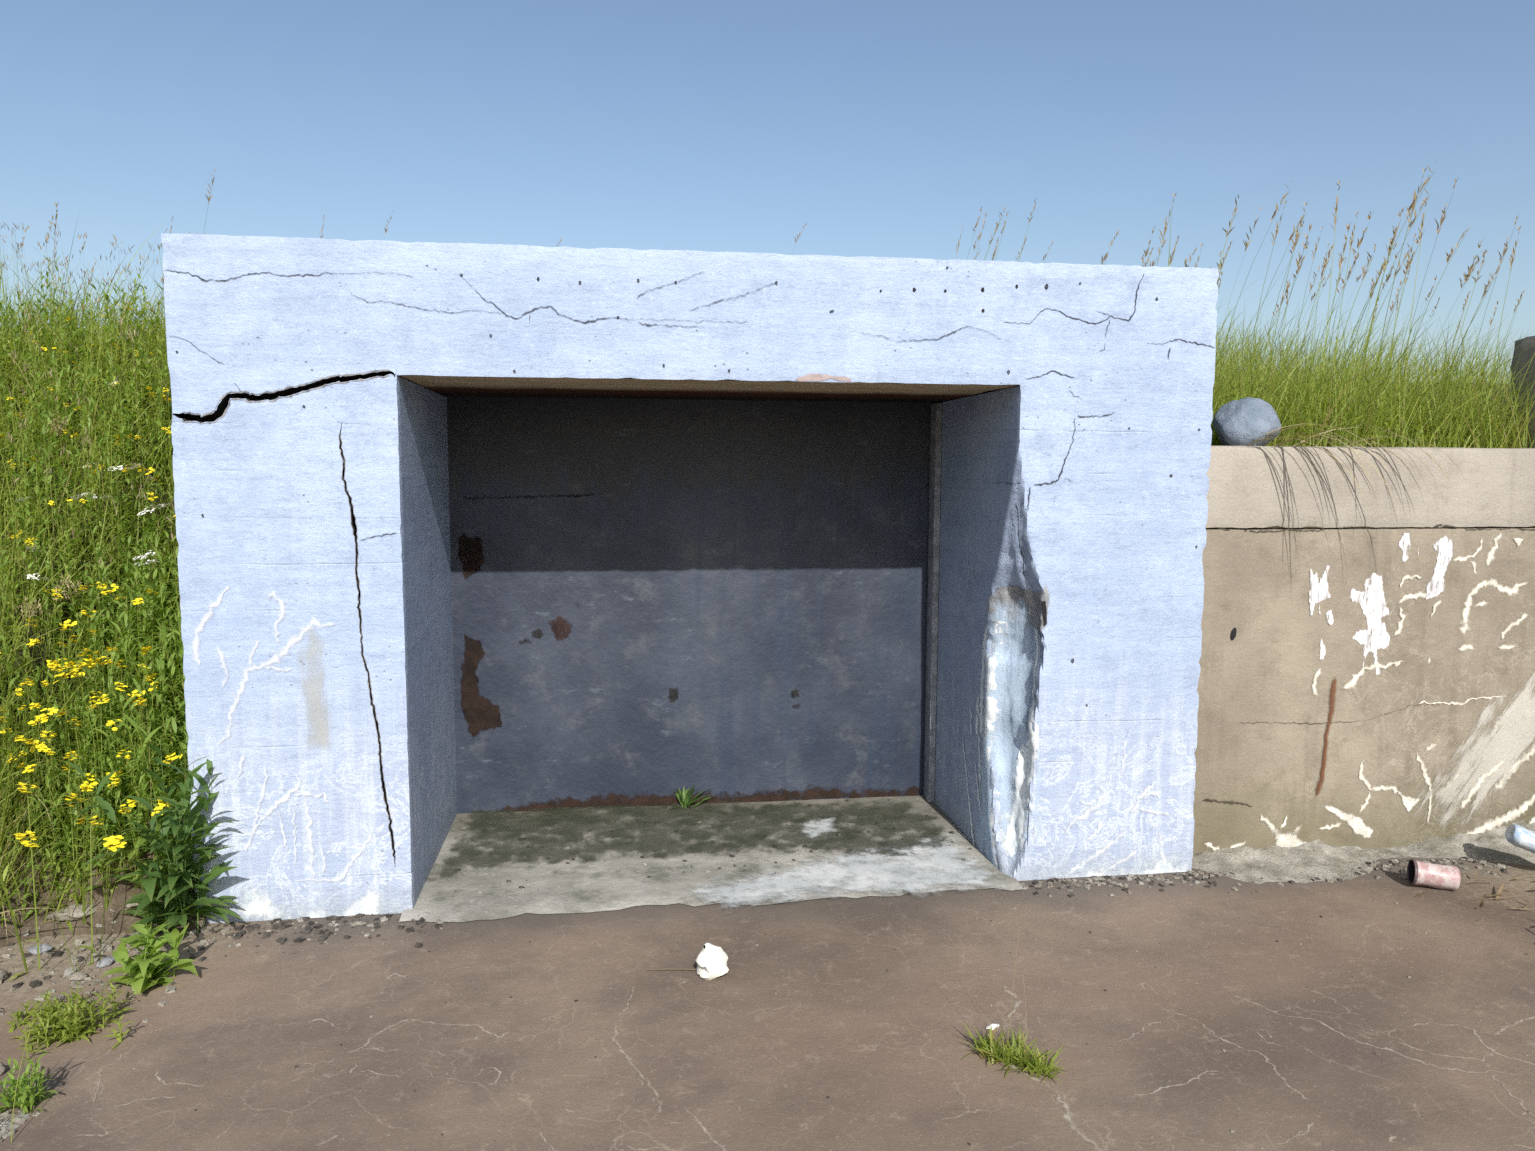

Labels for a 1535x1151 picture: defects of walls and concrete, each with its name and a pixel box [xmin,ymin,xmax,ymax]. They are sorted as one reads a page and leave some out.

crack [169,270,776,327]
crack [169,336,400,424]
crack [339,423,396,863]
spalling [988,585,1050,632]
rust [1316,678,1337,795]